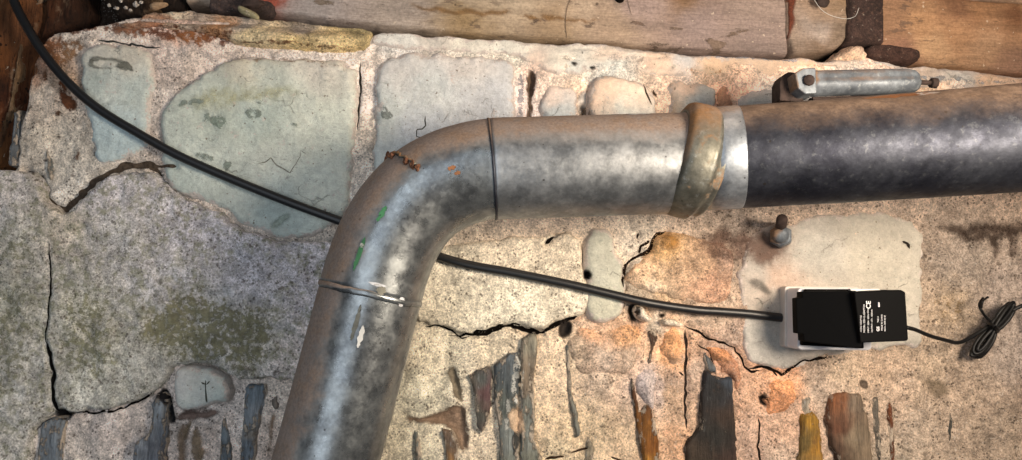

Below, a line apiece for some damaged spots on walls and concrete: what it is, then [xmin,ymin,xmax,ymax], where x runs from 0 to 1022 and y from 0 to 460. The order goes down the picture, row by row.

crack [29,161,176,212]
crack [621,232,664,287]
crack [37,251,153,429]
crack [425,316,577,339]
crack [679,326,827,428]